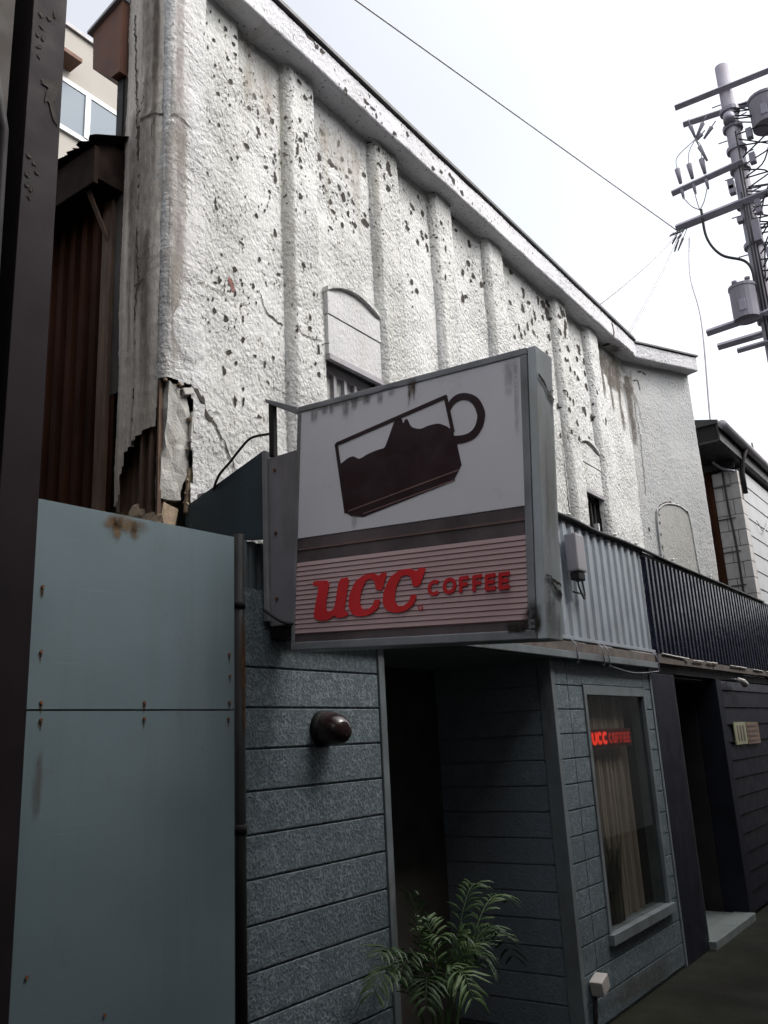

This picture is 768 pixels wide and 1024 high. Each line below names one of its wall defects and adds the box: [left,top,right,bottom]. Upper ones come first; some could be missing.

spalling [117,377,195,526]
crack [180,383,235,470]
rust [106,517,137,538]